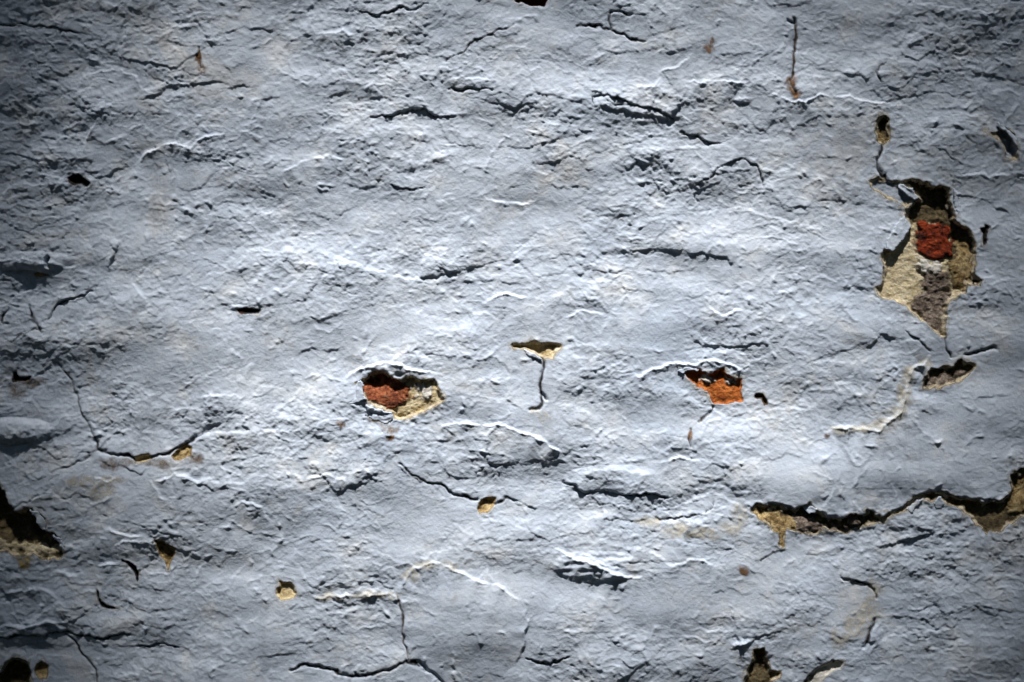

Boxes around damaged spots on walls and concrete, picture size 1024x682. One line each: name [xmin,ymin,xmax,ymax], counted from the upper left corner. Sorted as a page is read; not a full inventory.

rust [786,77,801,99]
spalling [869,175,990,337]
crack [59,364,208,463]
spalling [350,371,446,423]
spalling [508,340,563,361]
crack [532,358,546,410]
spalling [678,367,768,405]
spalling [923,357,977,390]
spalling [0,484,66,561]
spalling [751,468,1024,549]
crack [294,598,440,680]
spalling [742,648,782,682]